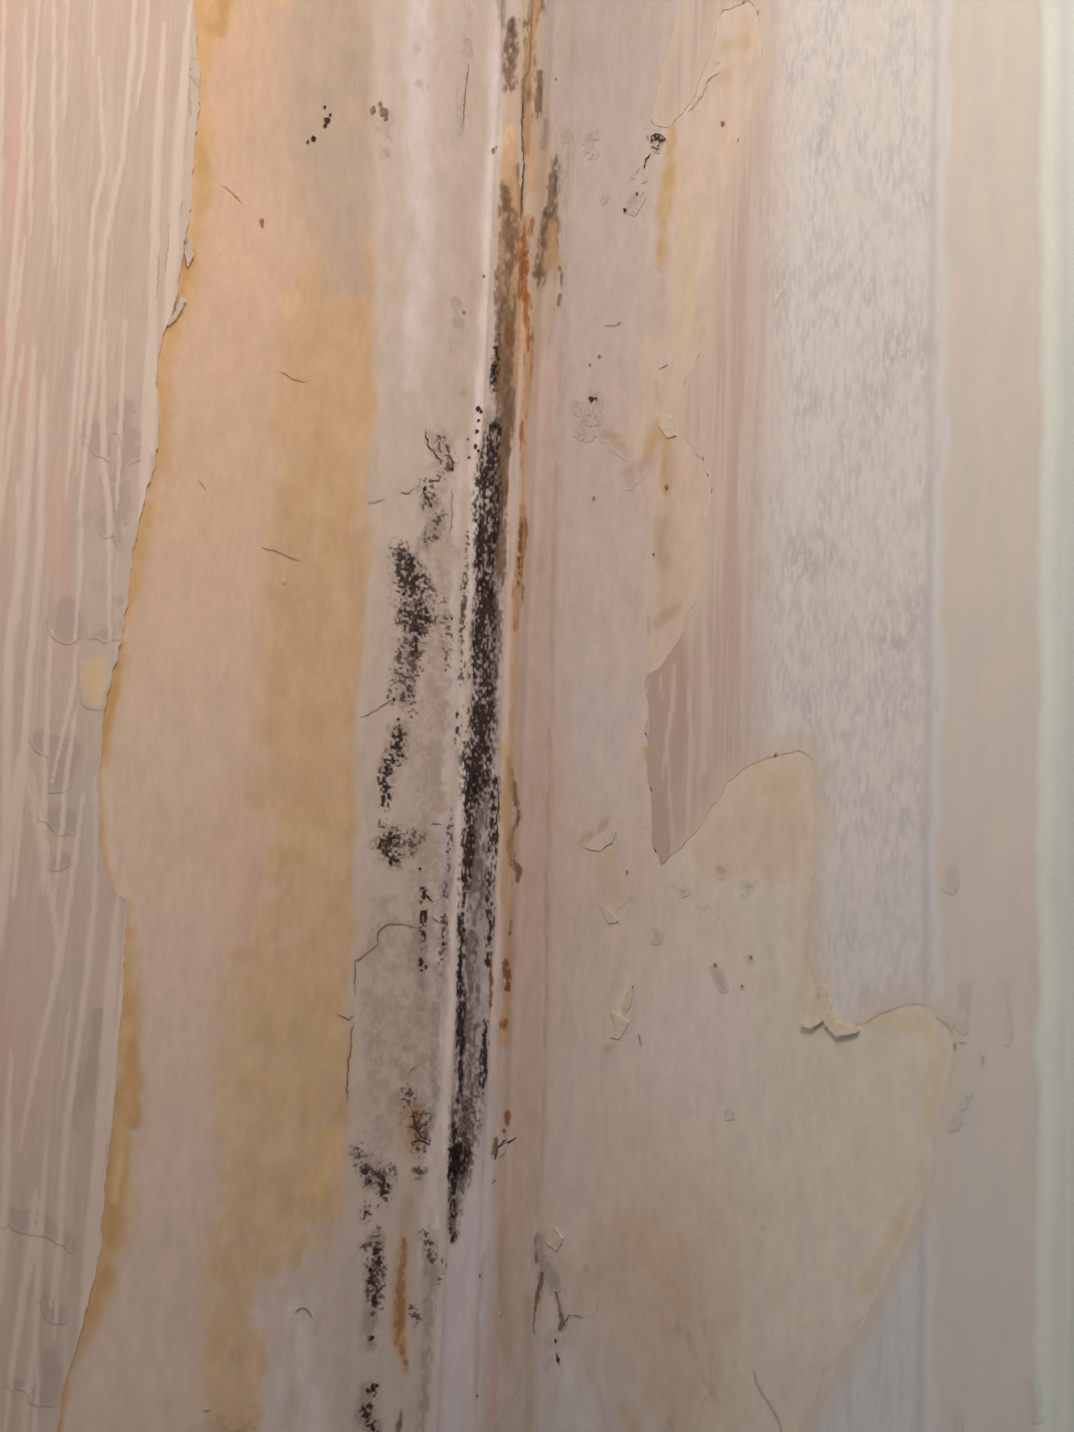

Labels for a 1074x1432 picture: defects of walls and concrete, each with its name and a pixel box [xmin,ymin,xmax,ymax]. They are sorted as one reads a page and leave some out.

water stain [0,0,247,1432]
water stain [184,0,511,1432]
corrosion [502,1109,513,1135]
corrosion [487,1,568,1052]
water stain [495,0,603,1432]